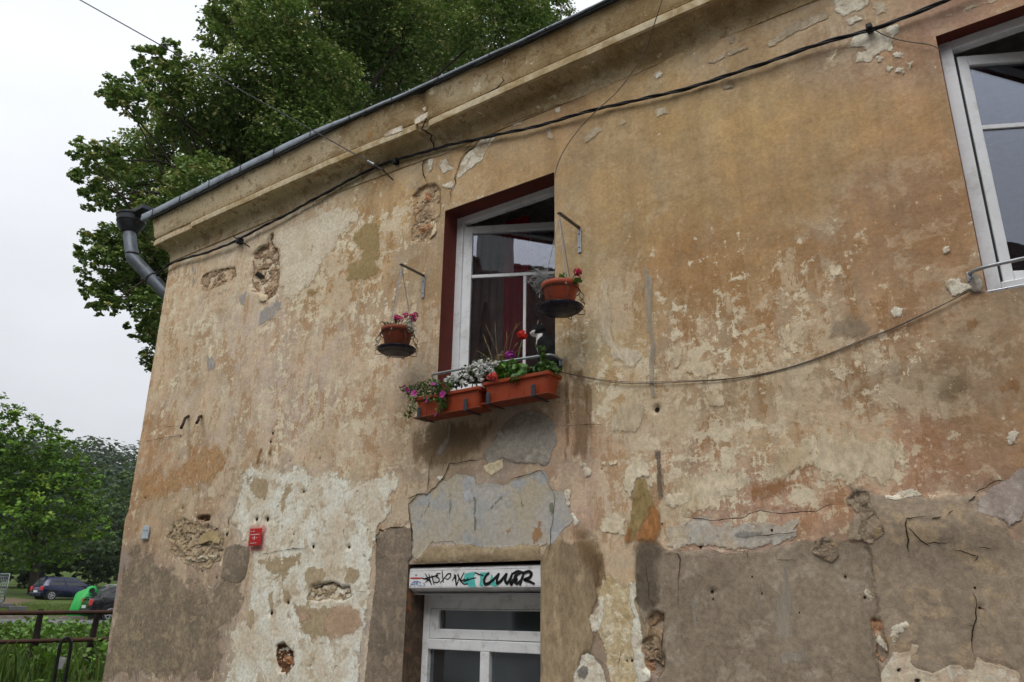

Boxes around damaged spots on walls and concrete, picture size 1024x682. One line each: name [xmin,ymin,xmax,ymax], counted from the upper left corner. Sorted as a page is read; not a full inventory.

peeling [765,0,913,74]
crack [421,118,436,182]
spalling [411,133,494,242]
spalling [192,266,236,297]
peeling [239,206,360,325]
spalling [167,515,223,571]
peeling [225,460,399,682]
peeling [409,459,579,559]
crack [686,504,845,560]
crack [905,480,1004,563]
peeling [574,576,665,682]
crack [969,595,984,653]